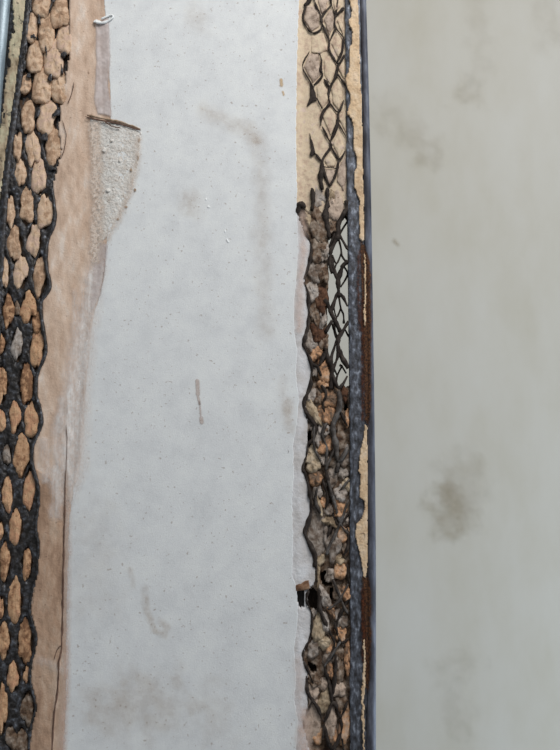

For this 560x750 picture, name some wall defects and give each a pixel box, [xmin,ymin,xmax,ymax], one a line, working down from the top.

flaking render [0,0,141,750]
flaking render [288,0,351,750]
corrosion [357,243,372,423]
corrosion [361,577,372,688]